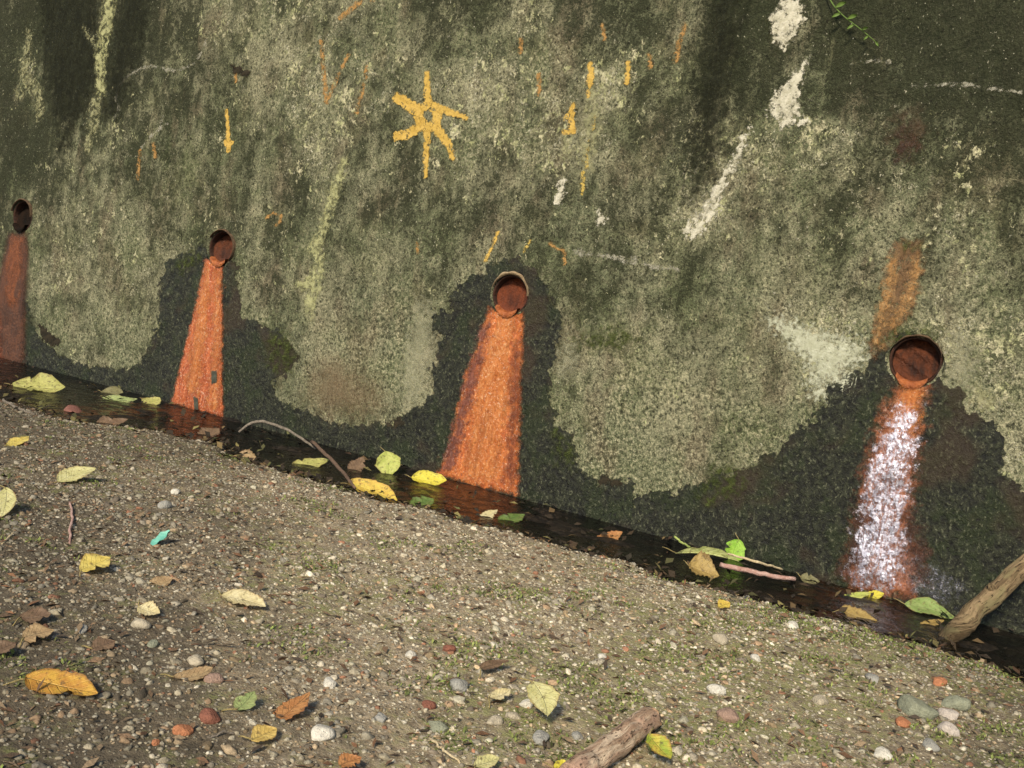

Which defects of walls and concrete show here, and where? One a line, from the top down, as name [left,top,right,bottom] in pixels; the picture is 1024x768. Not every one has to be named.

corrosion [0,233,28,363]
corrosion [172,259,223,417]
corrosion [437,310,523,495]
leakage [23,244,1024,616]
corrosion [837,384,932,599]
corrosion [869,239,925,358]
leakage [980,581,1024,636]